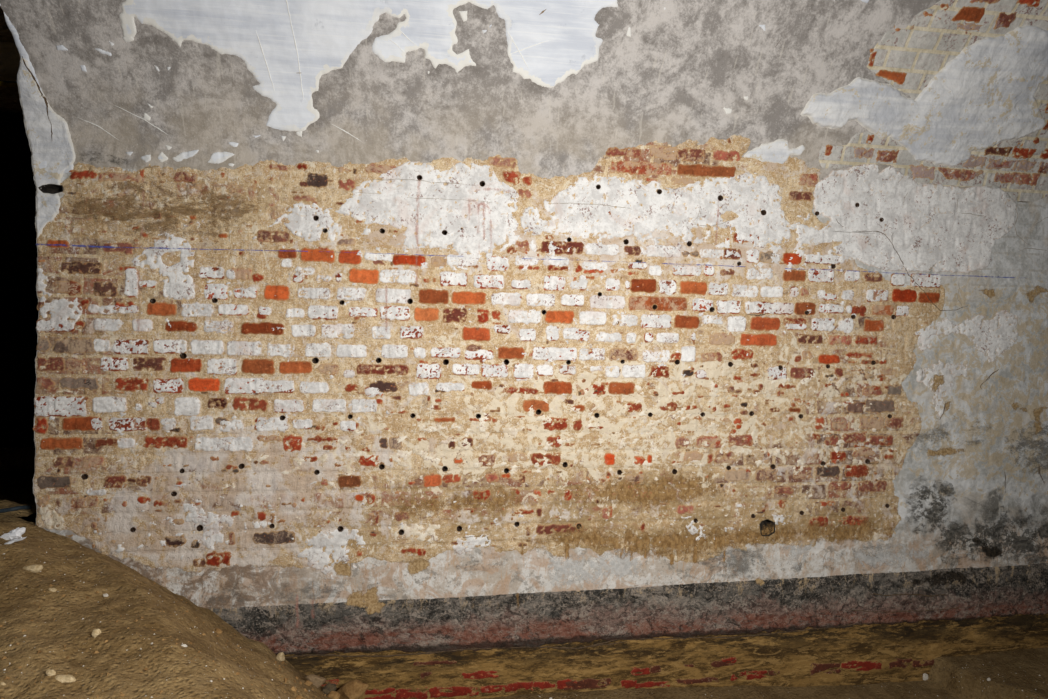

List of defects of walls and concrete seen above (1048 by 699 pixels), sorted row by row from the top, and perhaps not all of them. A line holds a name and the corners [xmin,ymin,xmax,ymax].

peeling [0,0,1048,202]
flaking render [1026,286,1048,303]
flaking render [33,135,945,576]
flaking render [1012,403,1047,434]
flaking render [927,447,964,456]
leakage [1008,426,1048,472]
leakage [571,472,718,510]
leakage [521,482,1048,585]